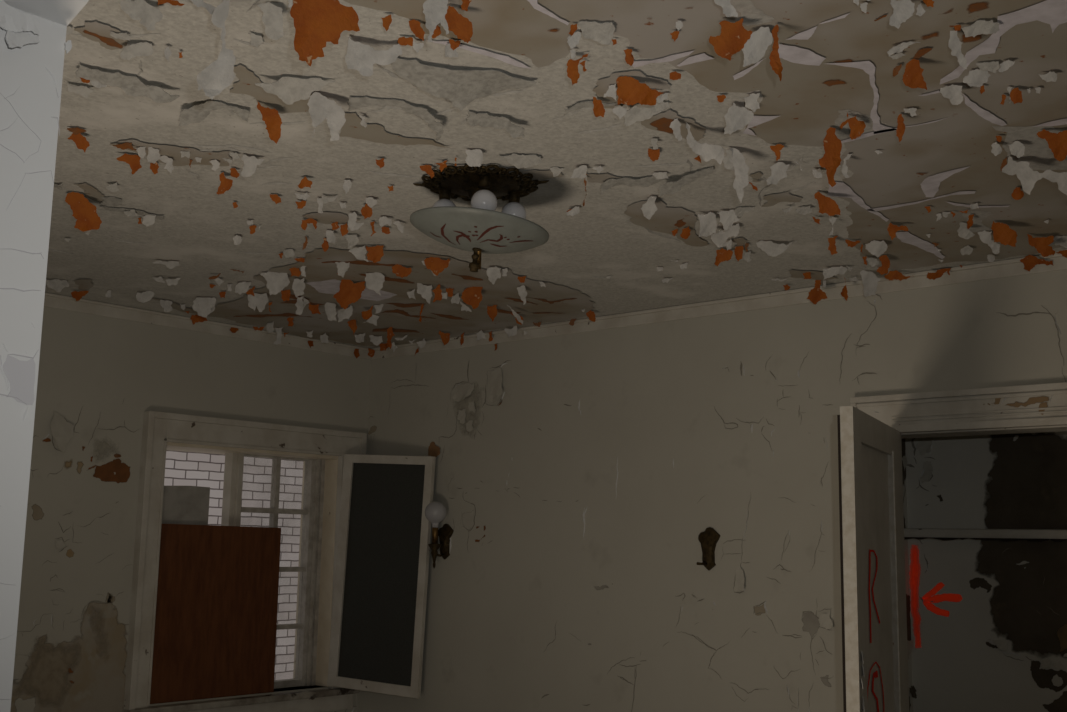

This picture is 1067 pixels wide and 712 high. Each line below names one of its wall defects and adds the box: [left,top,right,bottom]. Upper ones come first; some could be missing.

peeling [53,117,90,152]
flaking render [64,0,1067,304]
peeling [46,279,94,301]
flaking render [136,176,596,359]
crack [714,299,877,456]
crack [998,306,1066,382]
flaking render [88,453,130,483]
flaking render [969,432,1067,712]
flaking render [10,589,129,712]